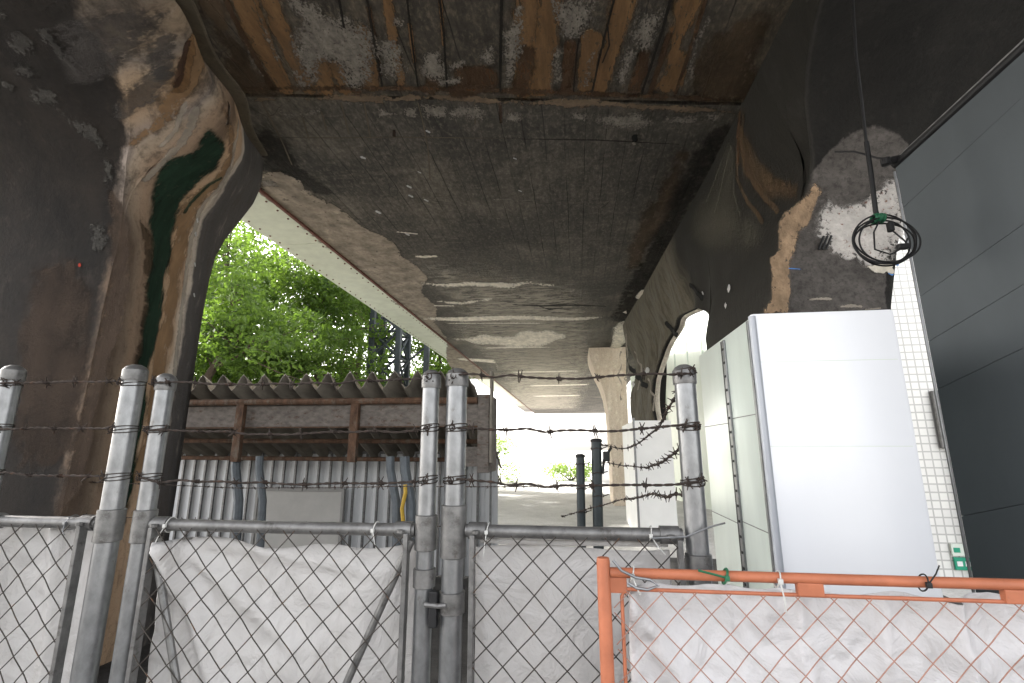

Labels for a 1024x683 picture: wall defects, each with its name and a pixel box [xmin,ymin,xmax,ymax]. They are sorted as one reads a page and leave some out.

water stain [134,102,239,376]
peeling [260,172,490,379]
water stain [288,0,525,91]
corrosion [223,0,798,224]
water stain [421,0,769,411]
spalling [764,178,905,314]
water stain [125,386,147,508]